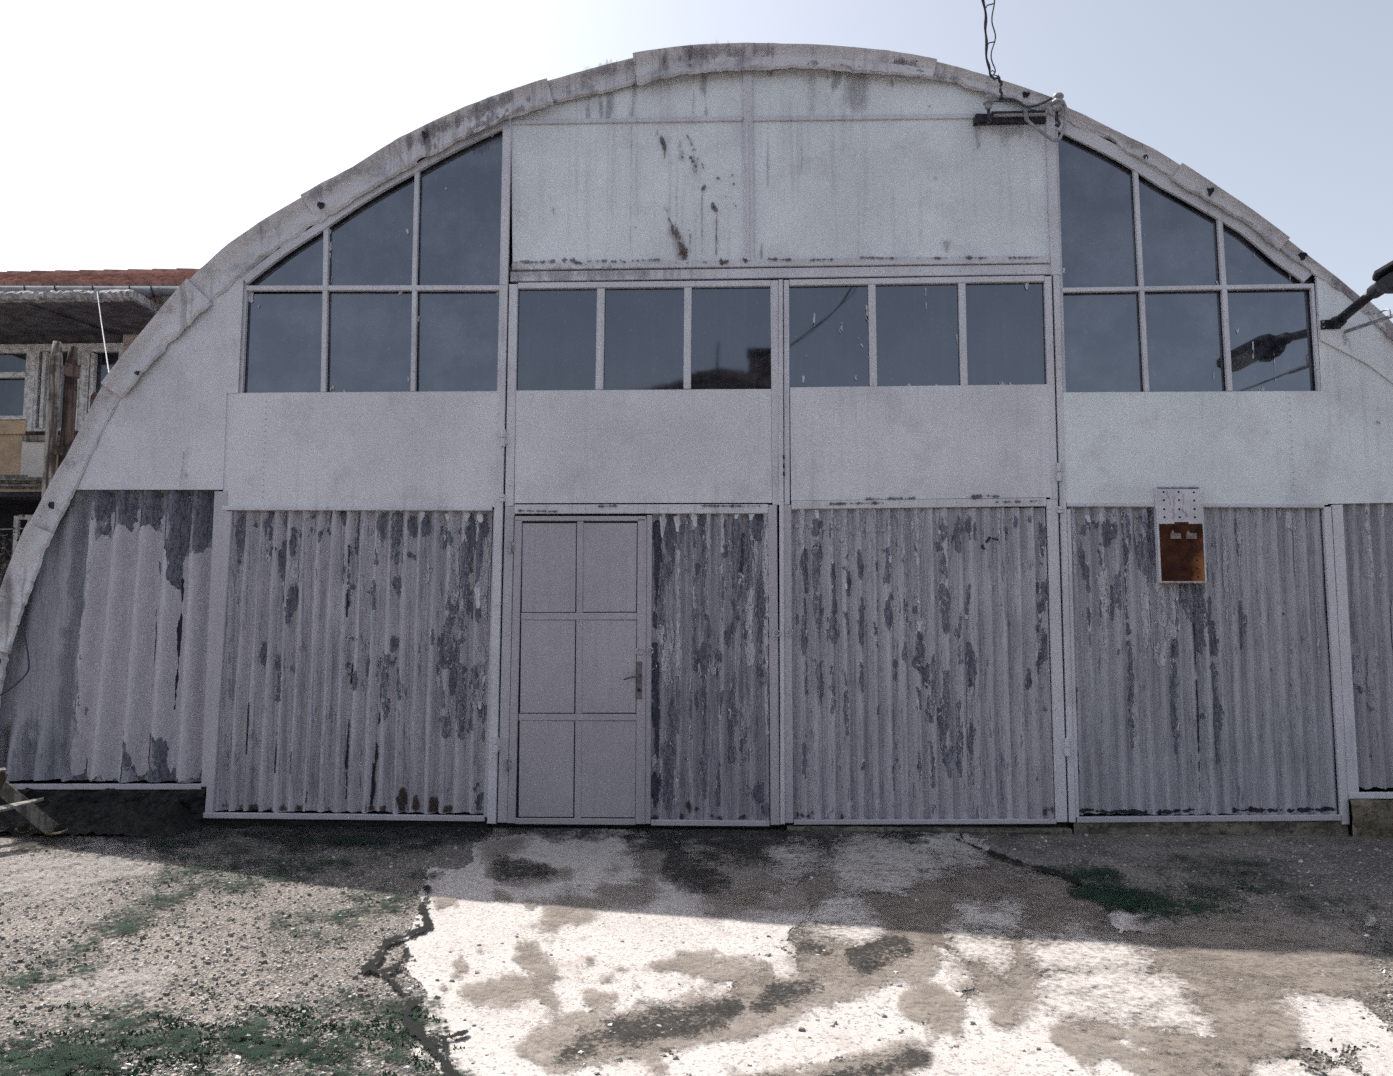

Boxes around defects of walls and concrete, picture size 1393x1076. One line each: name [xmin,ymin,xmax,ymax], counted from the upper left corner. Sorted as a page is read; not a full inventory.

rust [515,218,691,264]
rust [657,131,747,265]
peeling [73,734,202,782]
peeling [93,490,215,589]
peeling [235,511,489,742]
peeling [651,514,769,819]
peeling [794,510,1049,814]
peeling [1077,508,1156,748]
rust [1159,522,1205,581]
peeling [1169,542,1225,767]
peeling [1238,600,1247,653]
crack [360,885,469,1076]